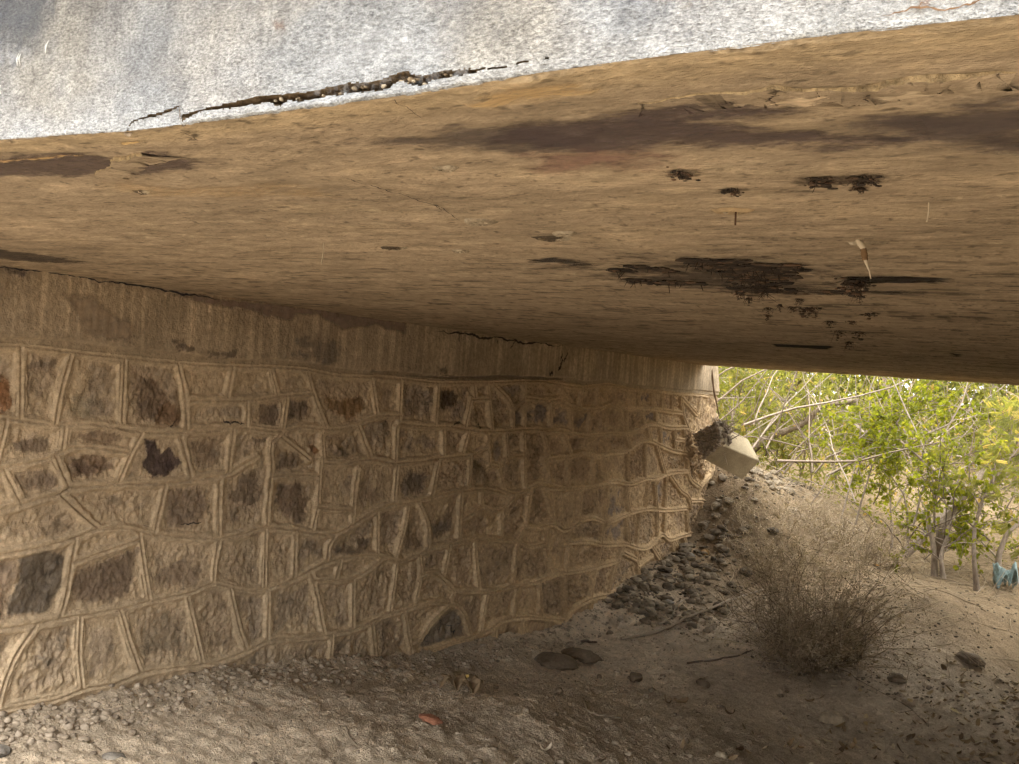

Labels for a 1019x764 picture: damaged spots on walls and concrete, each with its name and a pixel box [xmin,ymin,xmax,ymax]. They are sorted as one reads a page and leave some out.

peeling [774,97,824,107]
crack [94,57,549,180]
damp [390,97,1019,153]
damp [0,153,111,177]
damp [130,151,204,175]
damp [0,250,83,277]